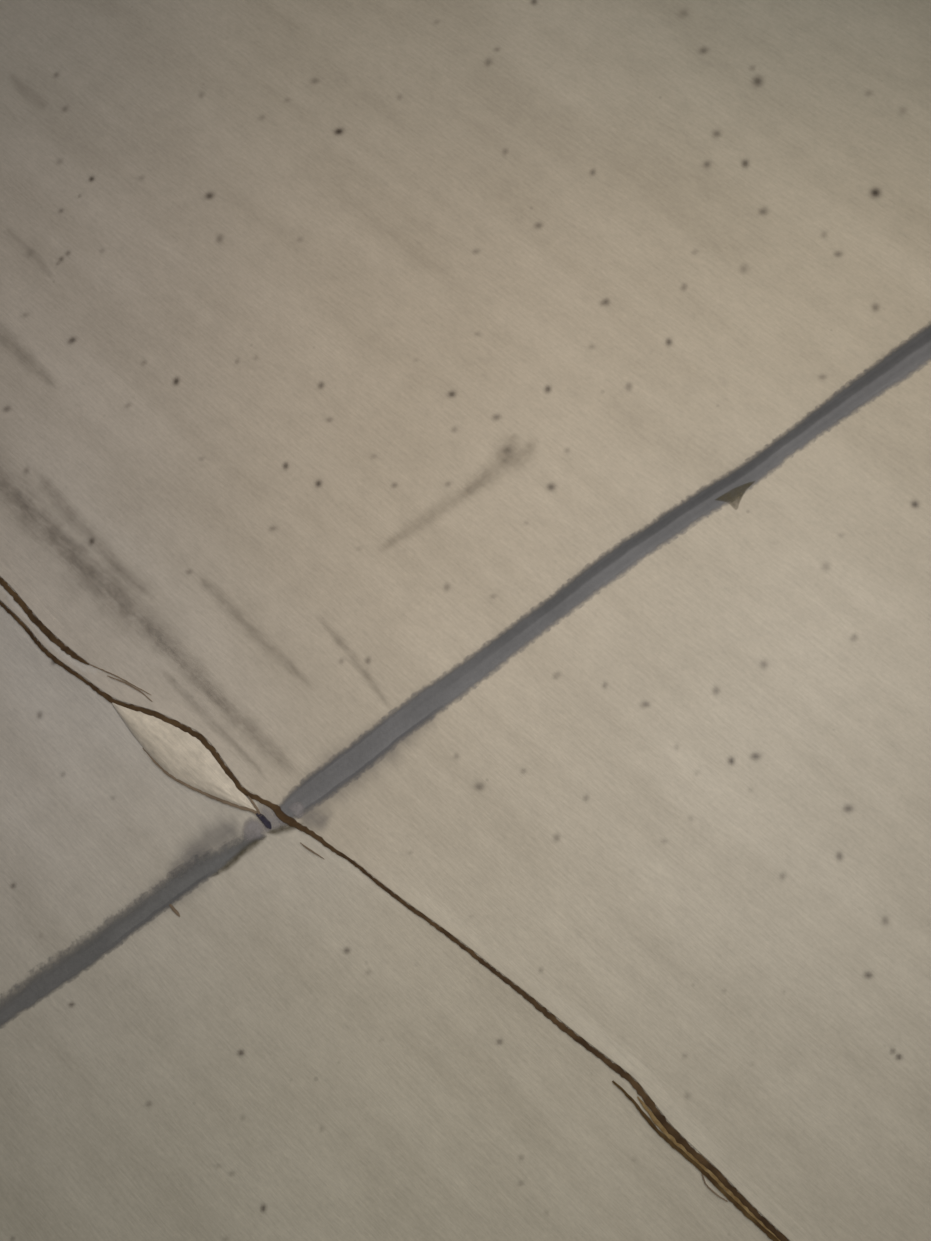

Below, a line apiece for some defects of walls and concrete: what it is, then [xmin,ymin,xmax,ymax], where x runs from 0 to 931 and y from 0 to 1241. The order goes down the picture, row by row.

crack [0,560,816,1241]